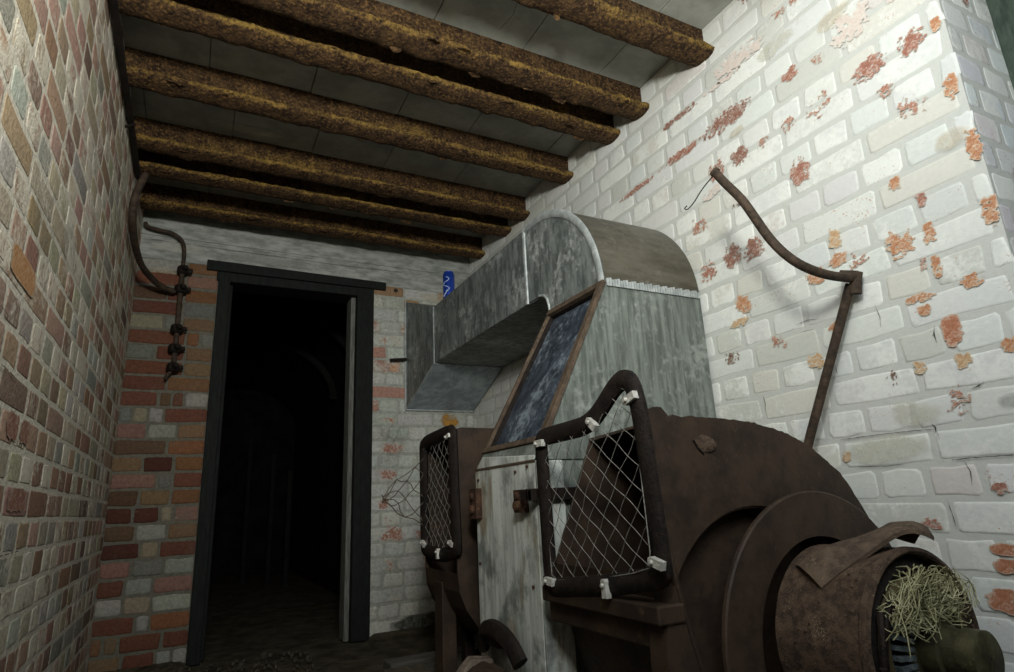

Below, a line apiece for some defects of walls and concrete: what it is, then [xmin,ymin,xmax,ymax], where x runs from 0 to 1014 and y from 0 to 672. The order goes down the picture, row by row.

peeling [850,15,942,84]
peeling [663,31,764,131]
peeling [877,83,931,118]
peeling [941,72,959,100]
peeling [619,96,751,203]
peeling [790,156,811,186]
peeling [964,127,983,160]
peeling [980,194,1000,226]
peeling [700,235,766,282]
peeling [885,221,943,278]
peeling [940,314,973,369]
peeling [989,543,1014,574]